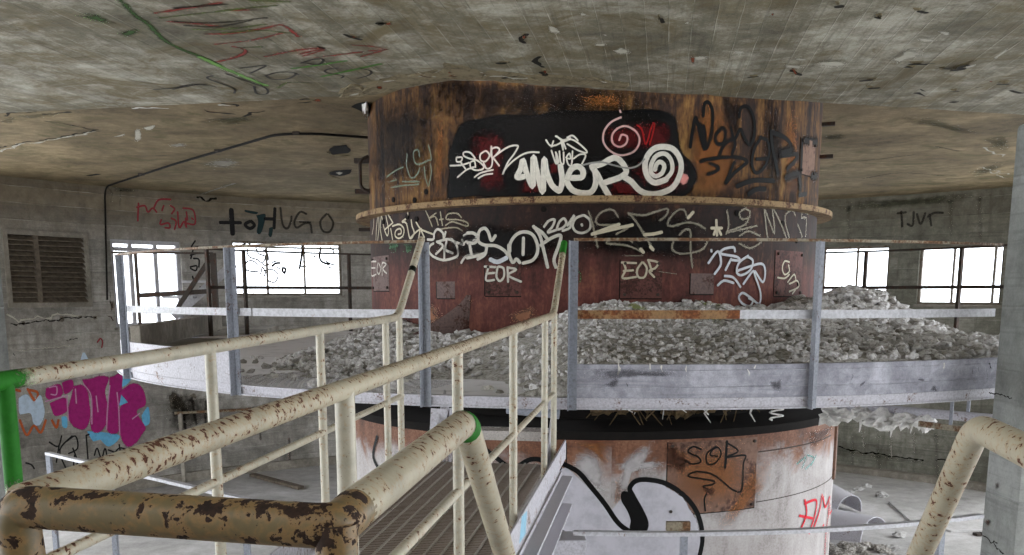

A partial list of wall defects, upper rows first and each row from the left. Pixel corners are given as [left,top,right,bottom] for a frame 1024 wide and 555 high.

spalling [894,32,977,71]
crack [0,121,96,152]
corrosion [711,127,728,175]
crack [6,313,114,356]
crack [838,446,946,462]
corrosion [689,456,732,492]